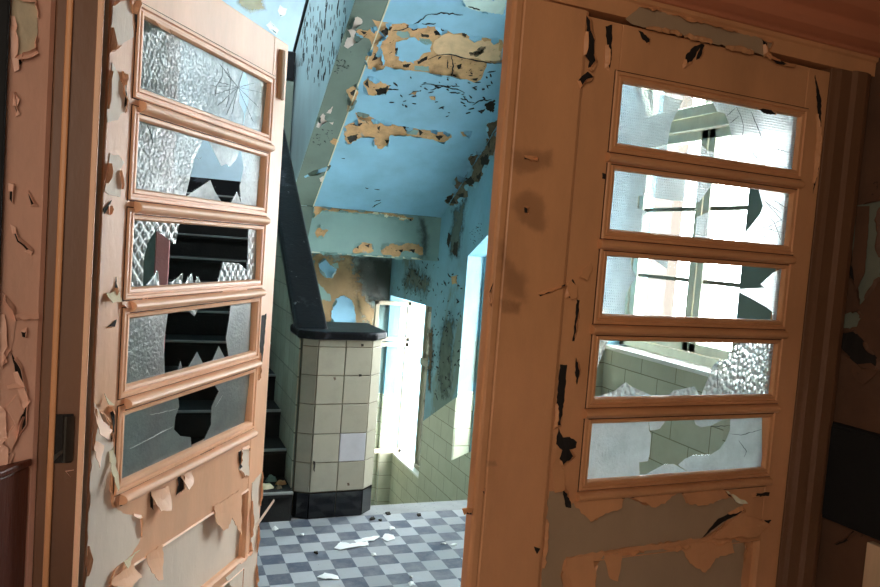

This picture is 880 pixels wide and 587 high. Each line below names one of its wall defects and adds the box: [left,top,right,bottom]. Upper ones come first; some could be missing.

peeling [316,17,503,149]
peeling [304,165,331,182]
peeling [315,242,430,323]
peeling [843,200,880,331]
peeling [0,291,17,368]
peeling [0,383,29,466]